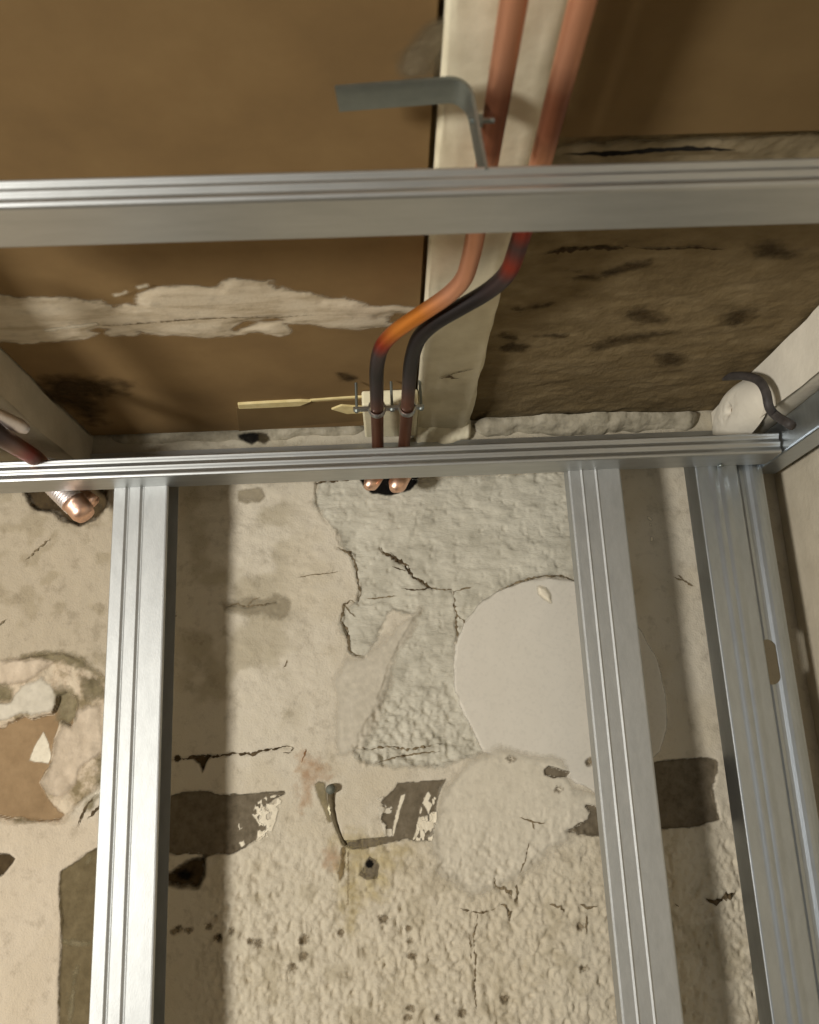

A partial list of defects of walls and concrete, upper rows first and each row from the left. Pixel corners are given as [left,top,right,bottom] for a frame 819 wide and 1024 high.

crack [562,146,732,157]
crack [298,547,471,657]
spalling [314,472,574,849]
peeling [0,652,105,823]
crack [172,746,293,760]
crack [358,744,440,763]
spalling [169,791,285,857]
crack [461,817,544,1010]
crack [549,904,597,933]